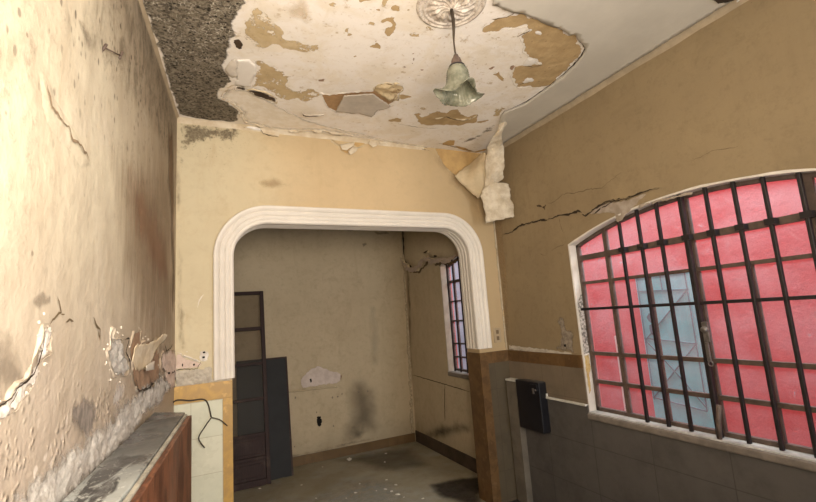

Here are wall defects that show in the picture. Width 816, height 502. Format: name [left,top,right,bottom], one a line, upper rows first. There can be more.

flaking render [245,8,318,52]
flaking render [359,0,410,36]
peeling [414,0,739,143]
crack [47,85,89,158]
peeling [220,58,411,155]
peeling [424,140,487,178]
crack [503,175,659,256]
peeling [103,326,230,392]
peeling [300,365,342,389]
efflorescence [16,377,171,502]
damp [433,478,479,502]